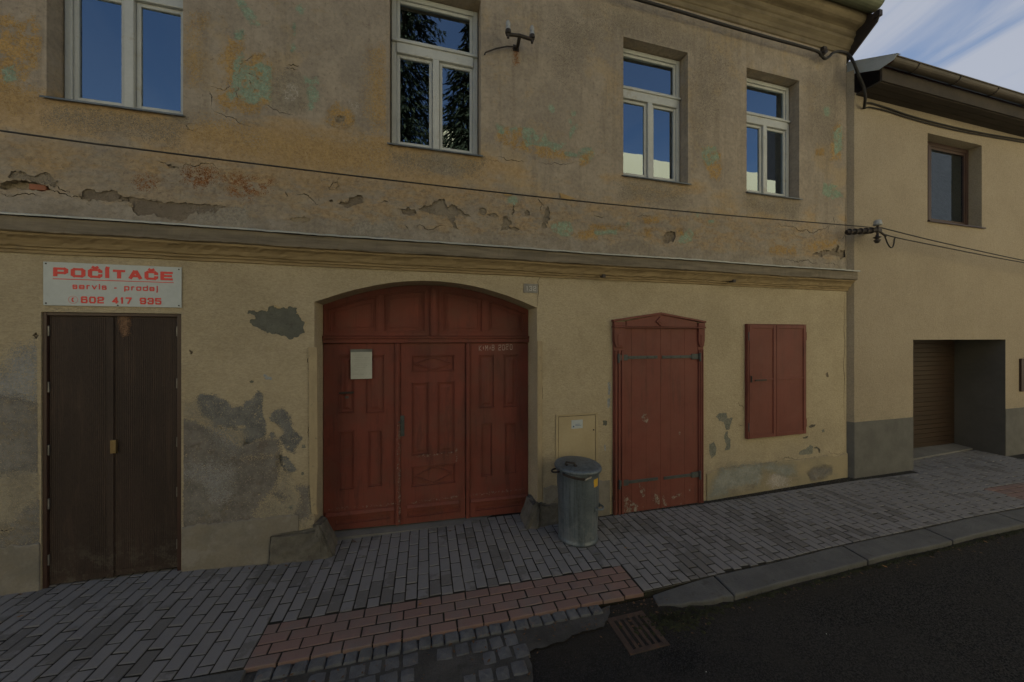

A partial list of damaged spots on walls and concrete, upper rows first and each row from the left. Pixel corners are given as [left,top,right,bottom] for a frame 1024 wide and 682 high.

flaking render [0,169,57,191]
flaking render [73,189,225,222]
flaking render [329,195,364,209]
flaking render [398,194,530,231]
flaking render [247,305,307,340]
peeling [709,413,733,458]